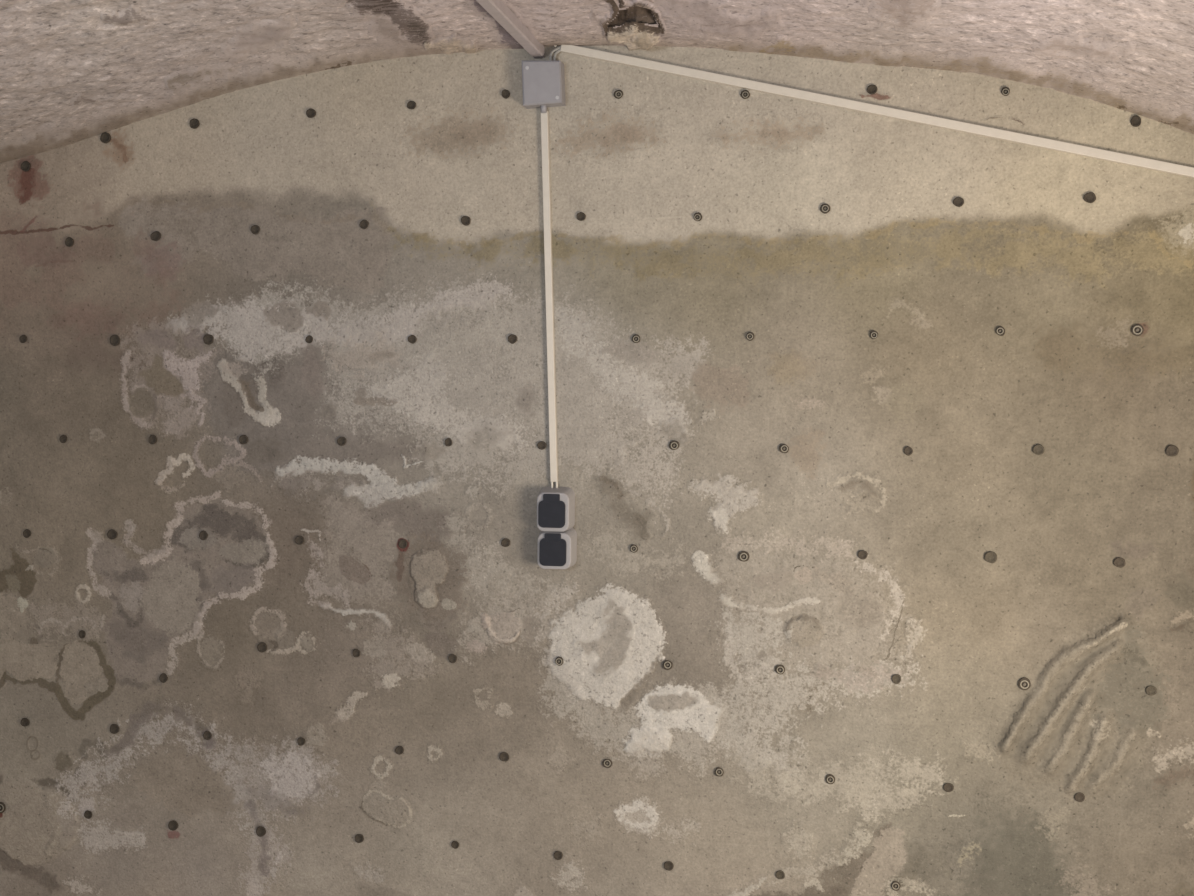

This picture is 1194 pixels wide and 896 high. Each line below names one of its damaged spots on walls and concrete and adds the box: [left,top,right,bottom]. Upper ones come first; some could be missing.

spalling [589,0,667,50]
water stain [0,188,1194,896]